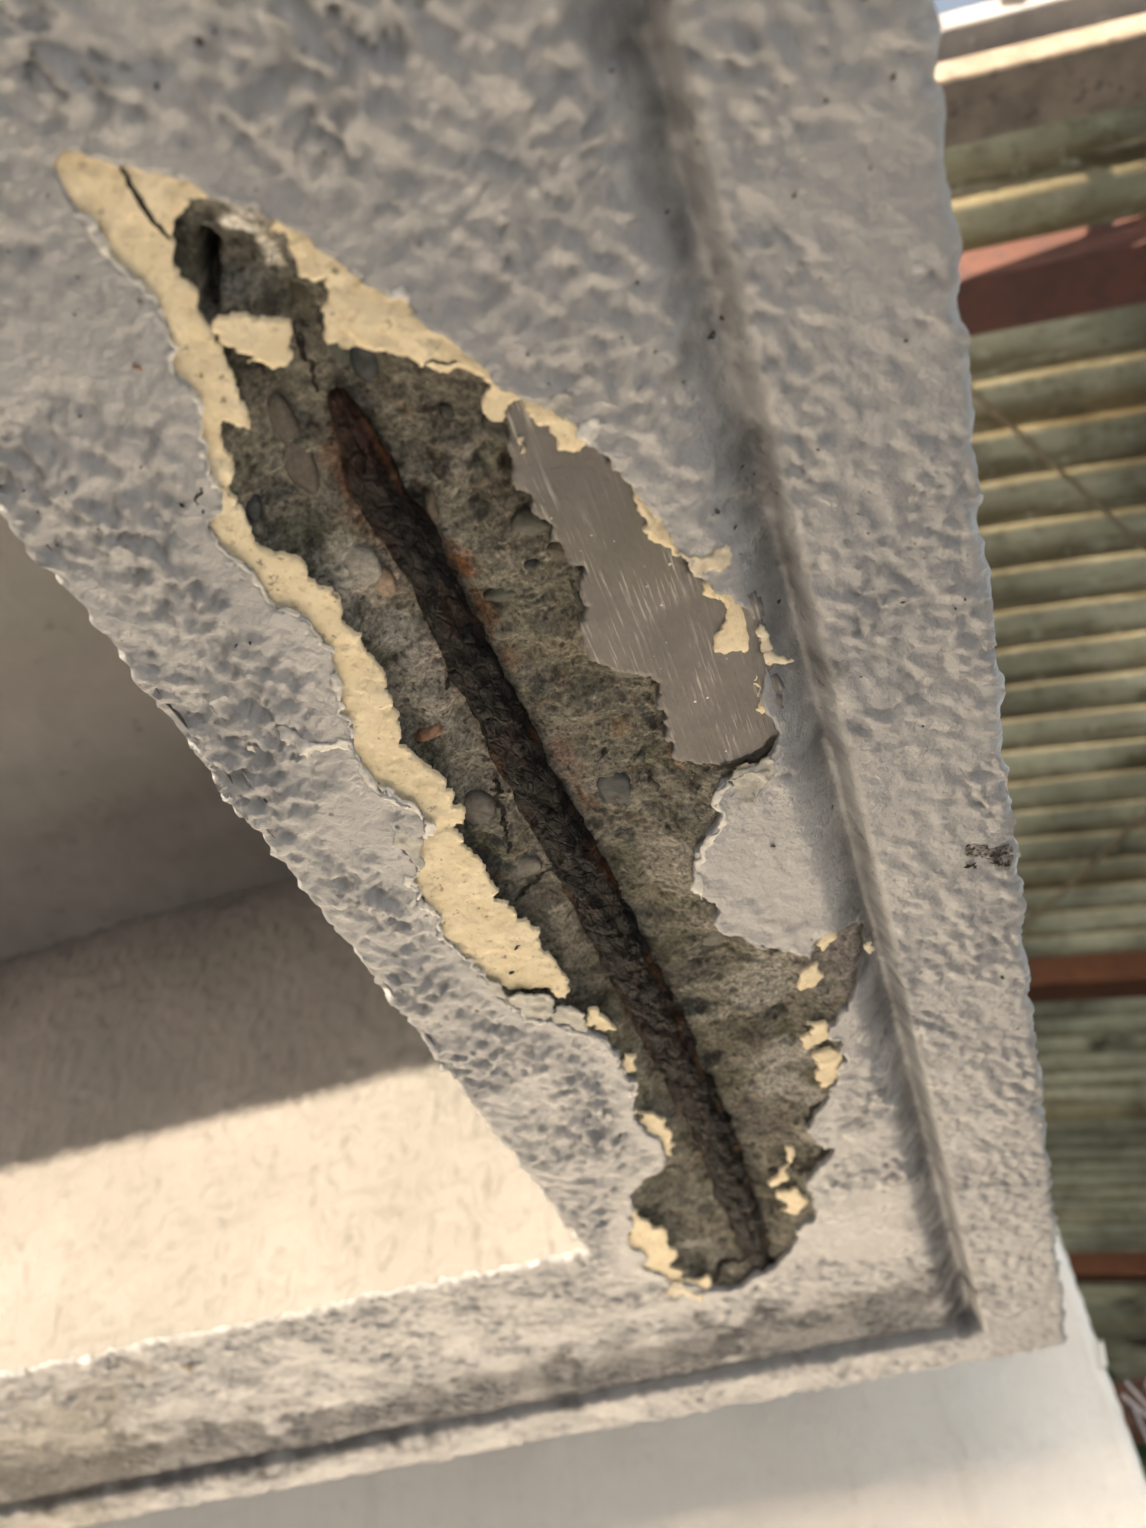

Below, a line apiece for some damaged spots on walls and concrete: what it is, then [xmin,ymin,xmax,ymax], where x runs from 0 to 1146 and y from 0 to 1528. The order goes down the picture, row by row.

spalling [53,151,875,1303]